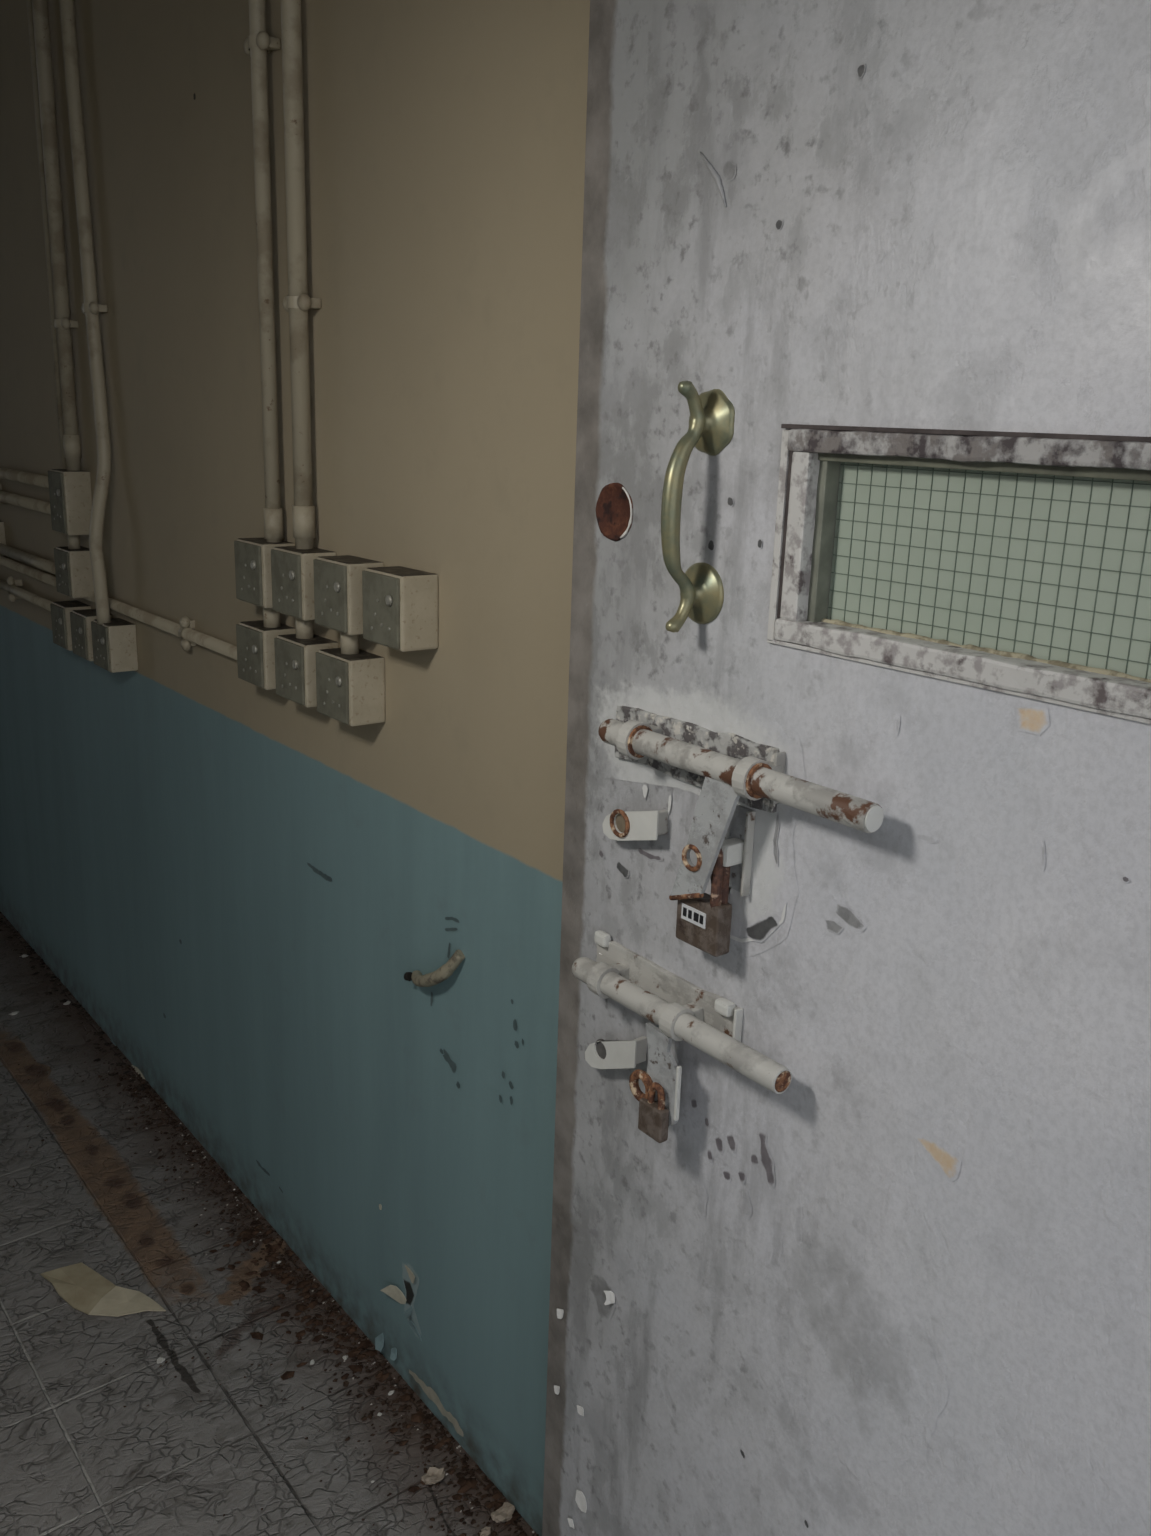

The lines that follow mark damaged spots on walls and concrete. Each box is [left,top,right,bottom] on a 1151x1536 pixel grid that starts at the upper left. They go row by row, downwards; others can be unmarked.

corrosion [682,844,702,872]
corrosion [629,1069,653,1101]
peeling [380,1256,423,1345]
peeling [375,1333,464,1437]